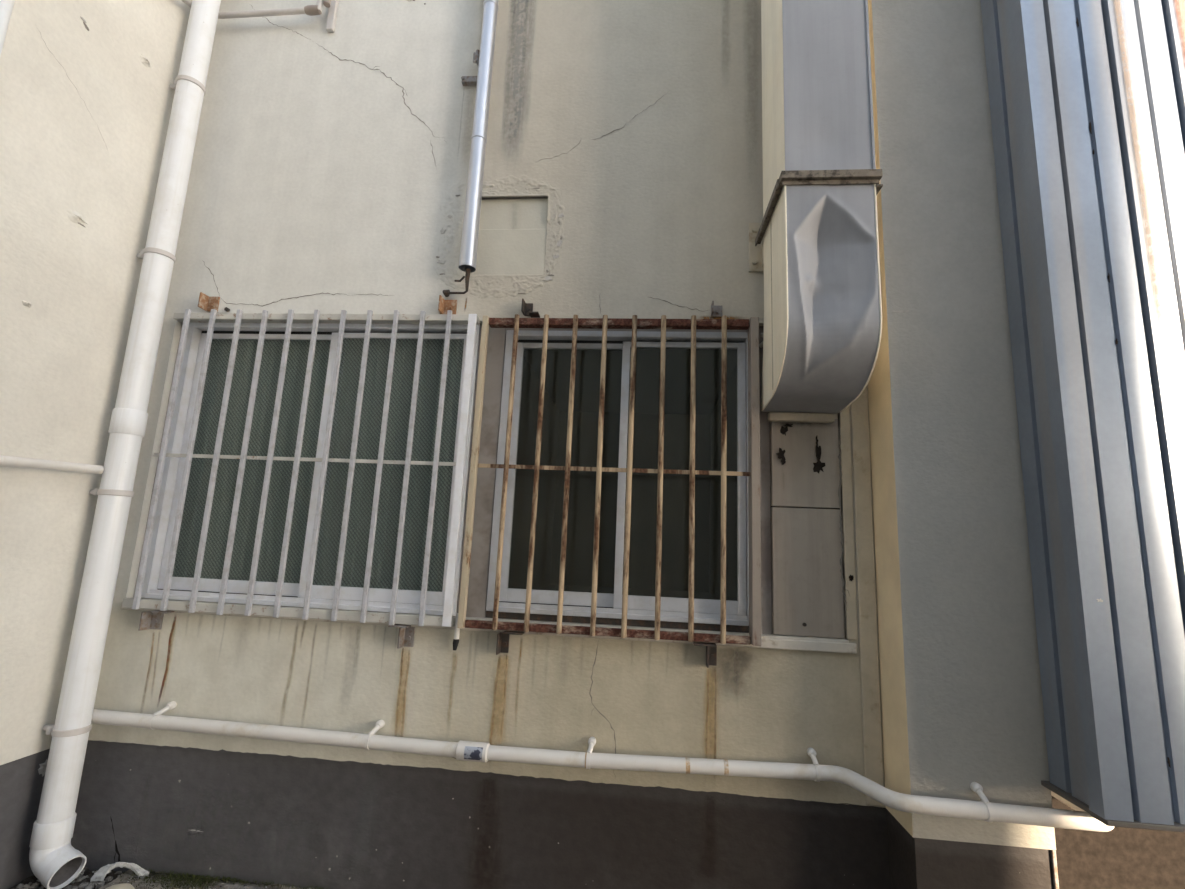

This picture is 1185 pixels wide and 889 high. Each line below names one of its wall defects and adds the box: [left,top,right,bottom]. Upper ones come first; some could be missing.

crack [251,5,444,170]
crack [539,95,664,161]
crack [203,261,392,306]
flaking render [433,175,565,298]
rust [154,617,176,698]
crack [589,645,616,772]